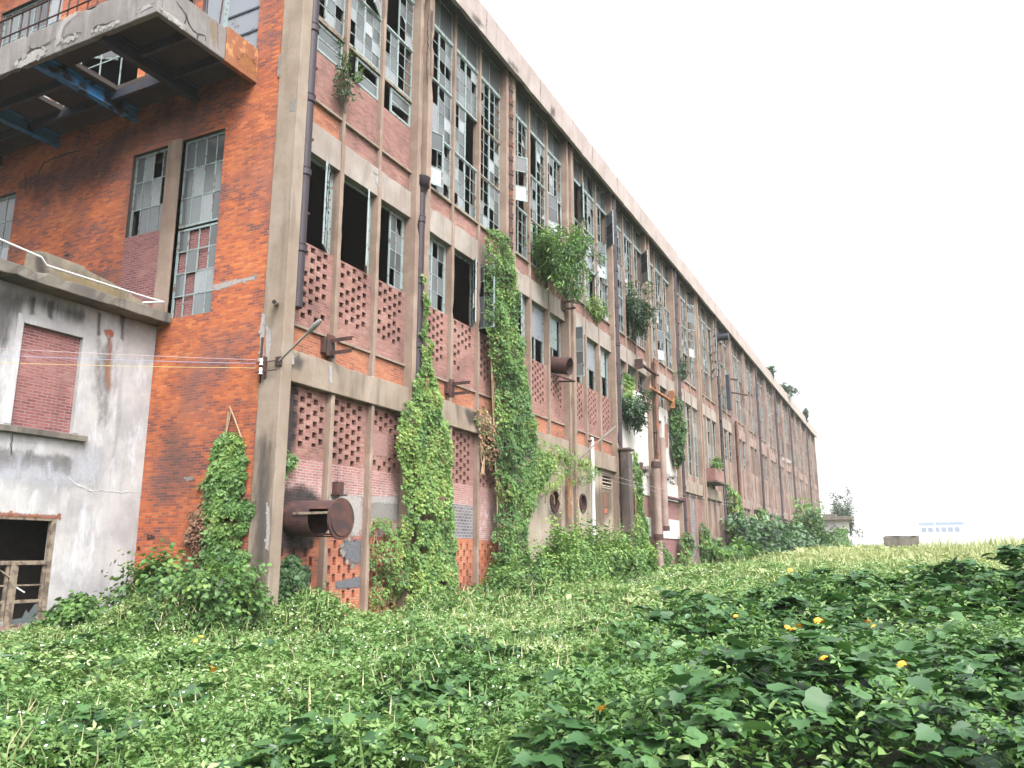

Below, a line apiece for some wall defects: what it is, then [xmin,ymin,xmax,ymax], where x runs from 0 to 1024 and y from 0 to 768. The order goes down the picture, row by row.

spalling [91,20,120,33]
spalling [135,0,187,30]
spalling [14,46,47,68]
leakage [0,292,84,343]
leakage [96,346,110,413]
spalling [336,531,362,589]